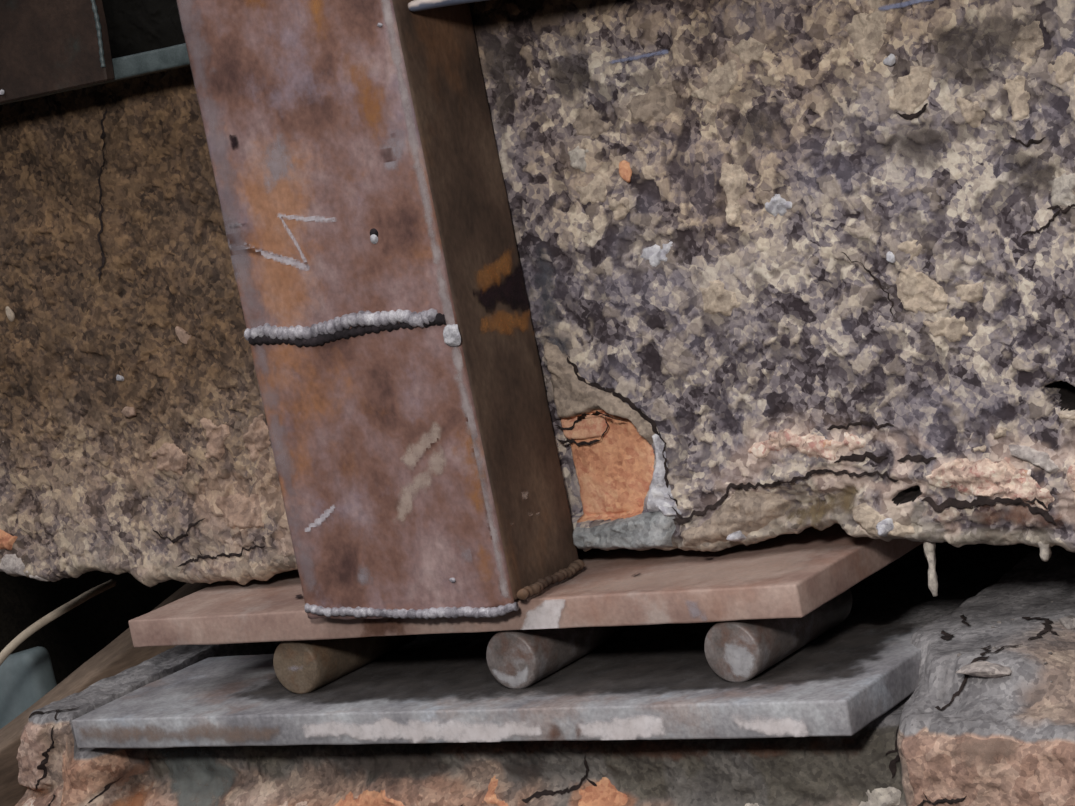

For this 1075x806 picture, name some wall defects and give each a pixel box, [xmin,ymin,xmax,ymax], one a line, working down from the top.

crack [97,109,107,283]
spalling [542,337,681,550]
crack [921,496,1056,524]
crack [935,615,1058,710]
crack [29,706,80,806]
crack [88,777,122,803]
crack [522,757,597,803]